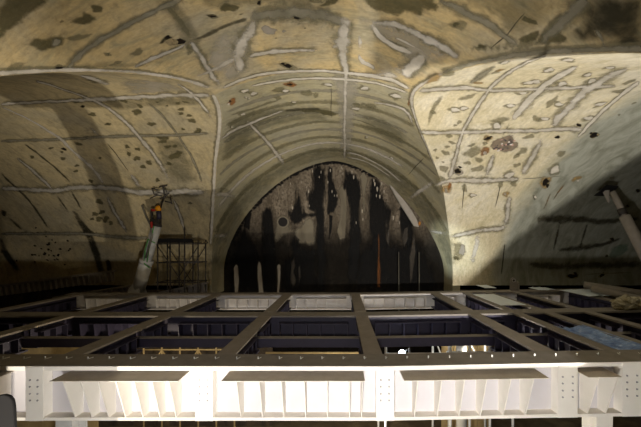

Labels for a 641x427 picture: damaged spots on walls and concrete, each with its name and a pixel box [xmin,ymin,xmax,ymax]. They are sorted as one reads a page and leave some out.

water stain [0,0,641,241]
spalling [484,135,518,152]
water stain [230,165,437,293]